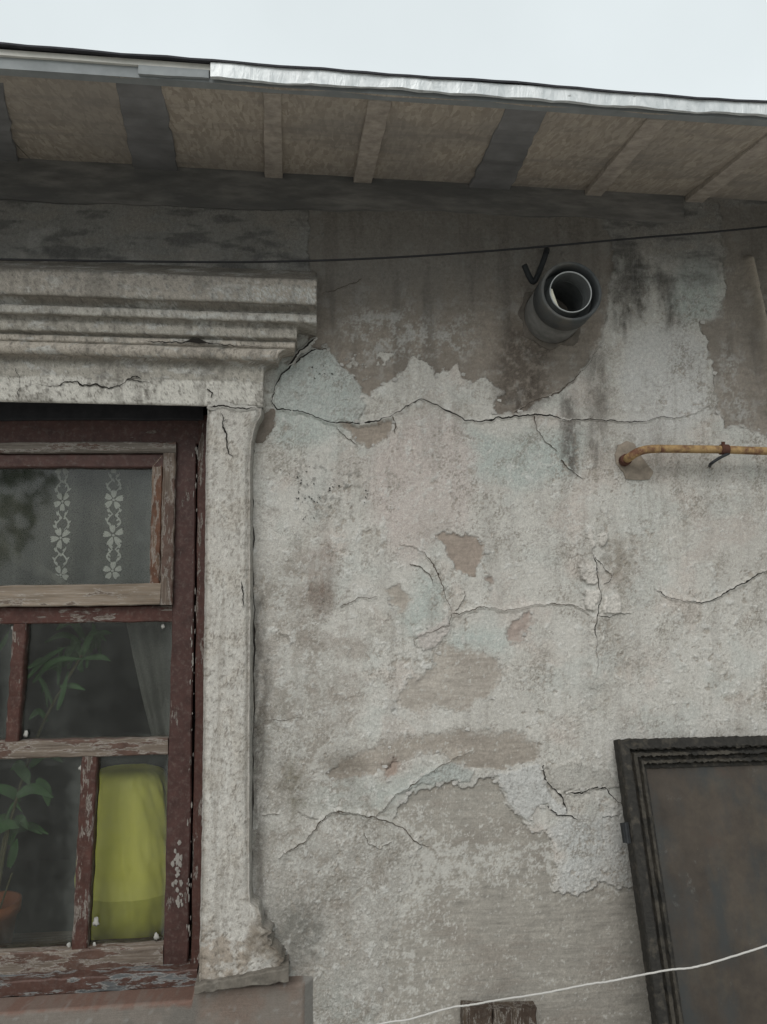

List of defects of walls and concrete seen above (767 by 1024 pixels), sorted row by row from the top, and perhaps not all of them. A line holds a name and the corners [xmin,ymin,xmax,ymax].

peeling [307,210,616,415]
crack [15,368,146,398]
crack [207,336,710,479]
peeling [435,531,494,591]
crack [400,543,631,679]
crack [654,568,767,606]
crack [241,499,471,874]
crack [542,765,622,820]
peeling [326,727,651,1024]